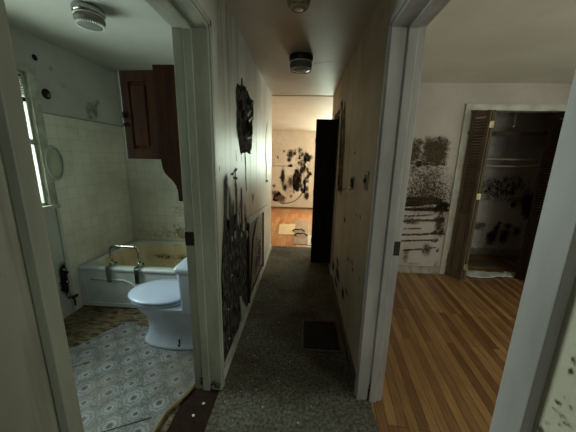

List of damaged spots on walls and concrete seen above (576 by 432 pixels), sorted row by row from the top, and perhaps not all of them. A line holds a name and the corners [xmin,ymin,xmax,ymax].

leakage [272,146,313,203]
leakage [401,136,453,264]